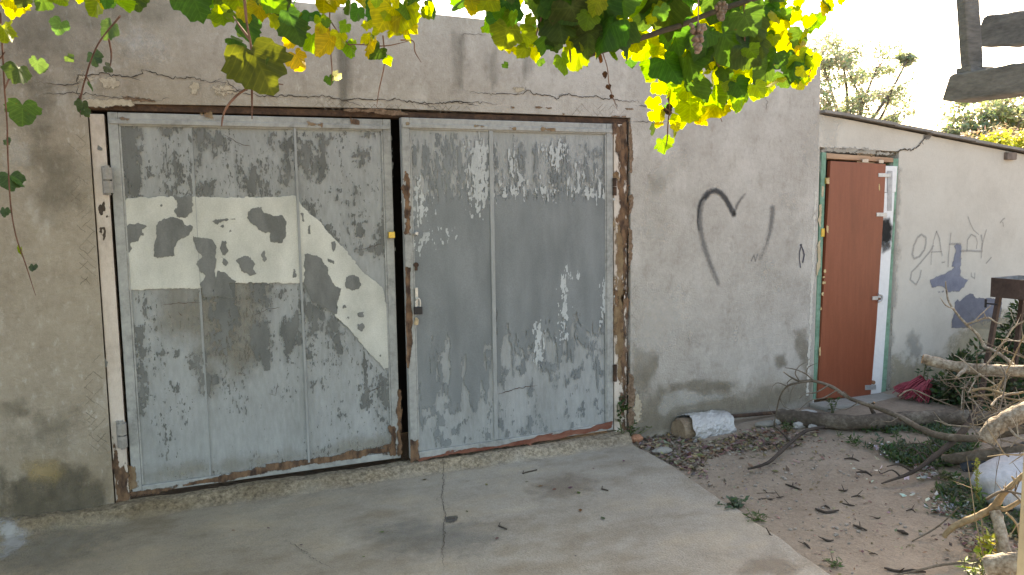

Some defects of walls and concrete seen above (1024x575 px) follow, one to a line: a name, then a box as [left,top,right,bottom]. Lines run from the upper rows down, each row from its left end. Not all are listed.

crack [40,70,666,123]
rust [613,121,630,430]
leakage [634,191,818,432]
leakage [0,464,104,557]
rust [112,437,130,503]
crack [436,460,446,567]